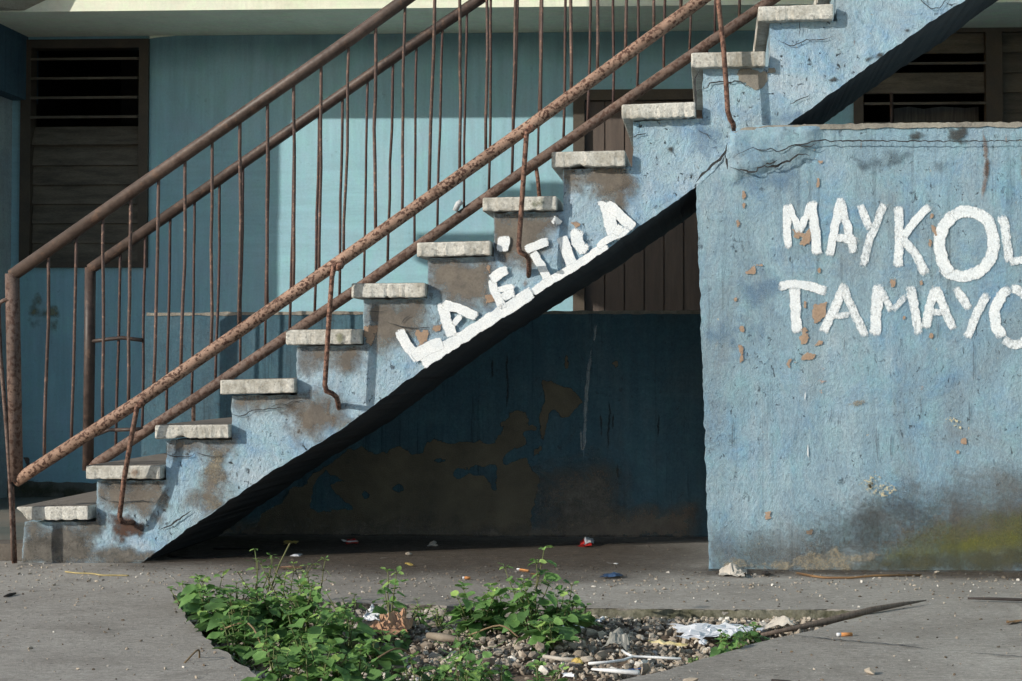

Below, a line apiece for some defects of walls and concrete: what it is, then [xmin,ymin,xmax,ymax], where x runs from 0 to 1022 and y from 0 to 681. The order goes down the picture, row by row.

crack [694,70,743,104]
crack [696,131,1022,182]
damp [711,481,1022,570]